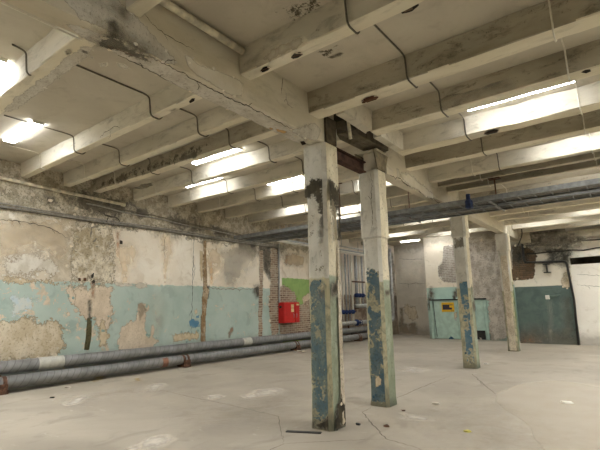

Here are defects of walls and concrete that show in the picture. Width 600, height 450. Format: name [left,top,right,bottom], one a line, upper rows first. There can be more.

spalling [4,0,320,144]
crack [118,55,294,130]
leakage [70,144,207,220]
leakage [305,177,341,243]
flaking render [0,295,67,361]
flaking render [0,206,234,350]
spalling [337,242,345,425]
peeling [366,268,385,404]
spalling [438,237,537,365]